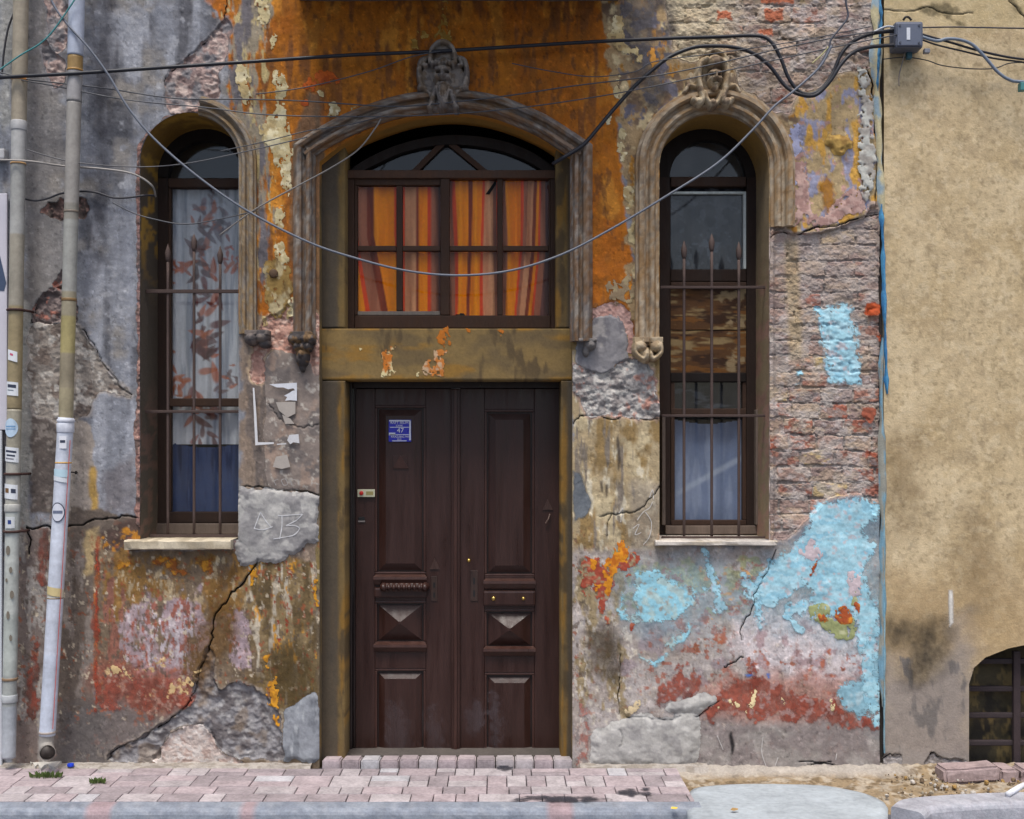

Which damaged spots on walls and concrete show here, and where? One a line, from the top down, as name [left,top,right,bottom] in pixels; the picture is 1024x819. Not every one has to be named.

spalling [41,0,68,88]
peeling [26,269,62,423]
spalling [73,18,253,527]
peeling [249,70,296,384]
spalling [572,273,660,420]
spalling [666,0,880,730]
crack [783,177,877,235]
crack [26,515,136,552]
spalling [91,536,285,763]
crack [158,563,257,728]
peeling [578,540,728,707]
water stain [893,625,939,677]